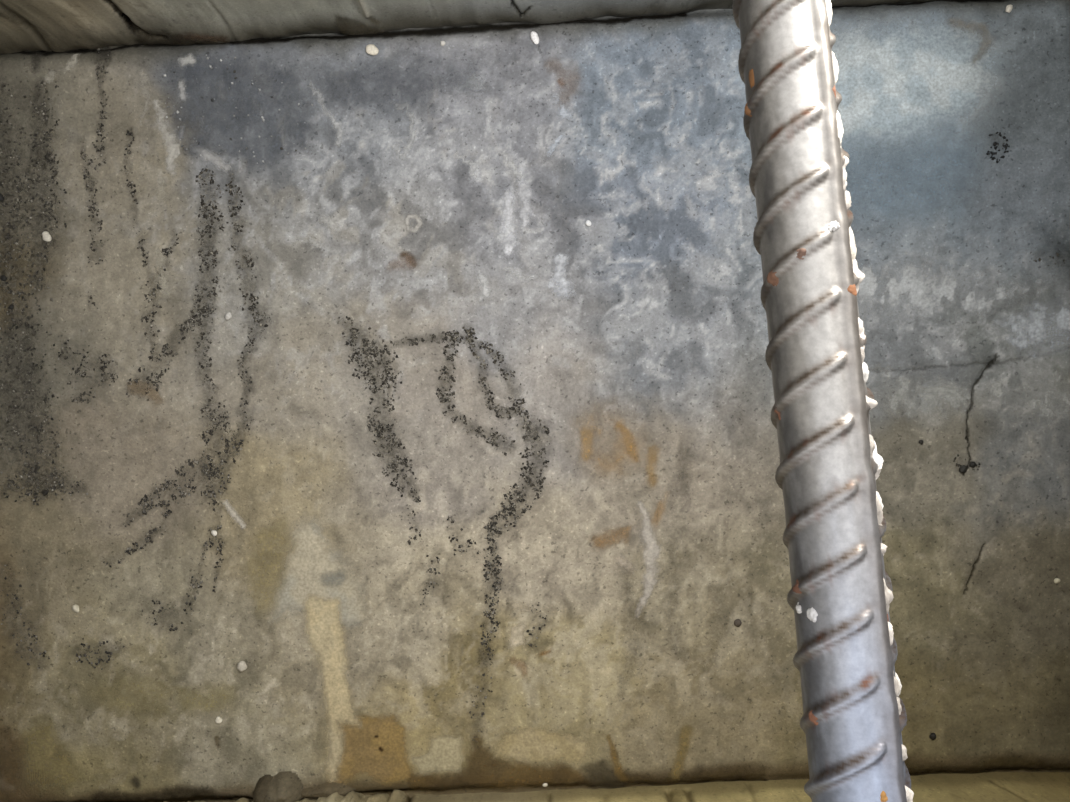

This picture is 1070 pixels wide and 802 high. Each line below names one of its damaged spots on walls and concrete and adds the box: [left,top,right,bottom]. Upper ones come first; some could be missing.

crack [10,0,687,55]
crack [832,0,1004,8]
water stain [0,48,343,631]
crack [963,354,997,475]
water stain [338,316,551,719]
crack [963,544,984,594]
water stain [69,638,125,670]
water stain [411,727,764,789]